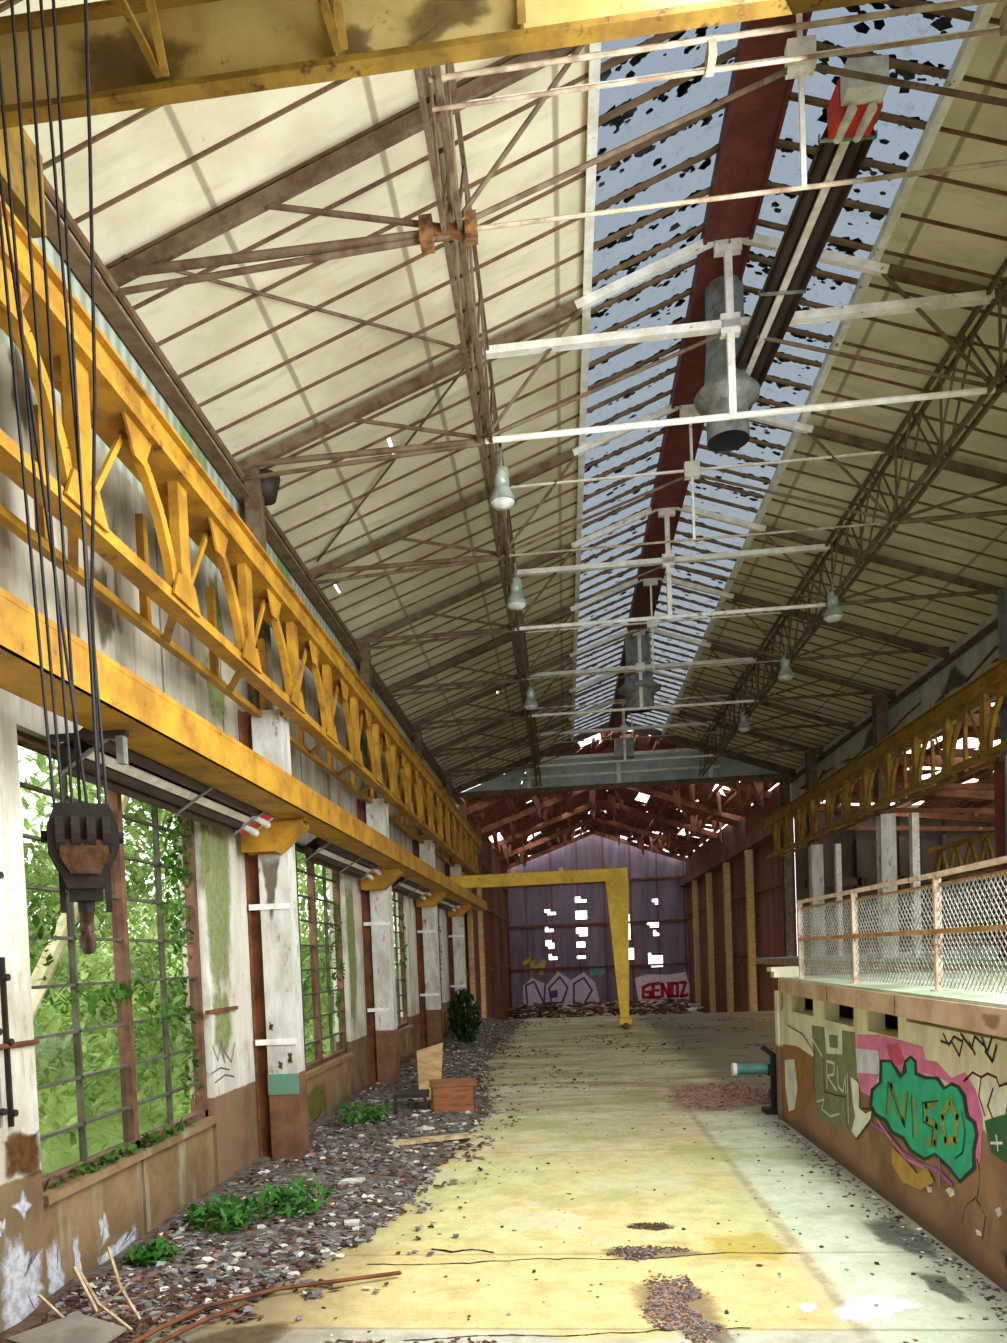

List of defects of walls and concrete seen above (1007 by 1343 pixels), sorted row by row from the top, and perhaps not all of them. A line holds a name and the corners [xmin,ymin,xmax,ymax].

leakage [201,823,210,885]
leakage [213,994,231,1056]
peeling [0,1191,42,1330]